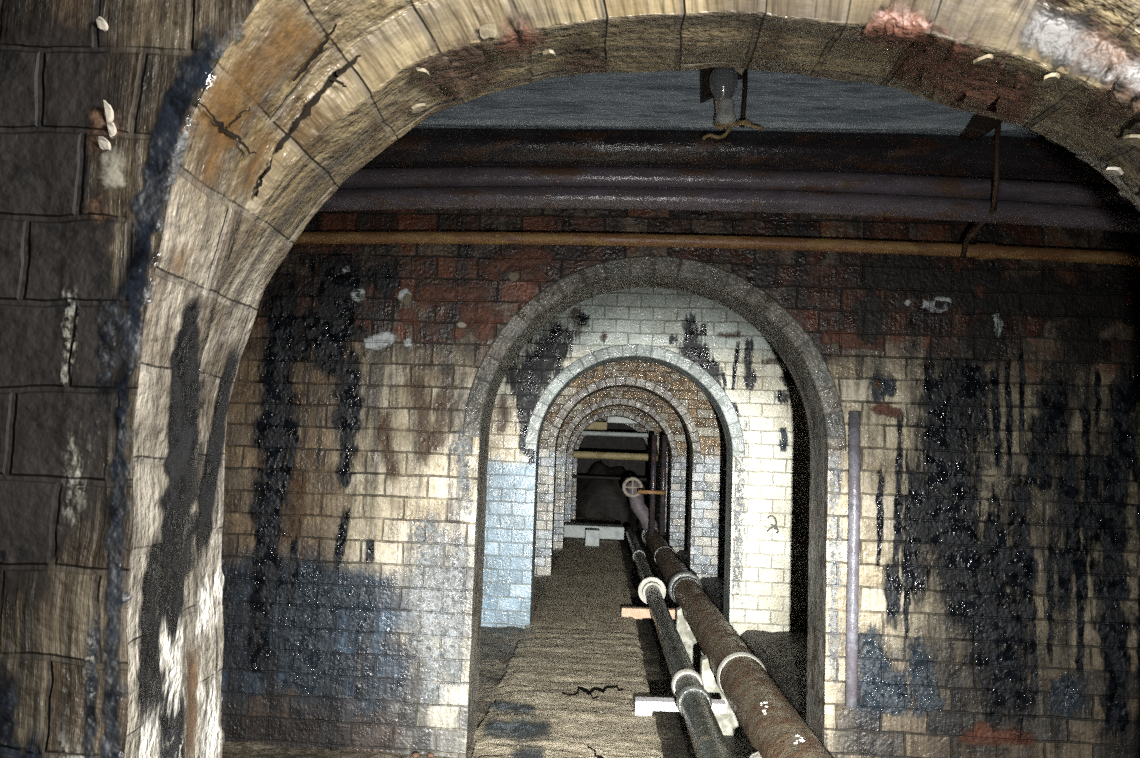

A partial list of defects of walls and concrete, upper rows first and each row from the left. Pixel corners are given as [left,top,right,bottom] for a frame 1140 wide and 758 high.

crack [193,24,361,197]
crack [1115,117,1140,139]
damp [905,297,951,313]
damp [139,536,224,758]
damp [198,349,239,558]
damp [334,508,351,572]
damp [366,539,374,562]
damp [332,332,412,488]
damp [405,516,471,706]
damp [405,376,476,515]
damp [858,453,946,718]
damp [954,313,1105,719]